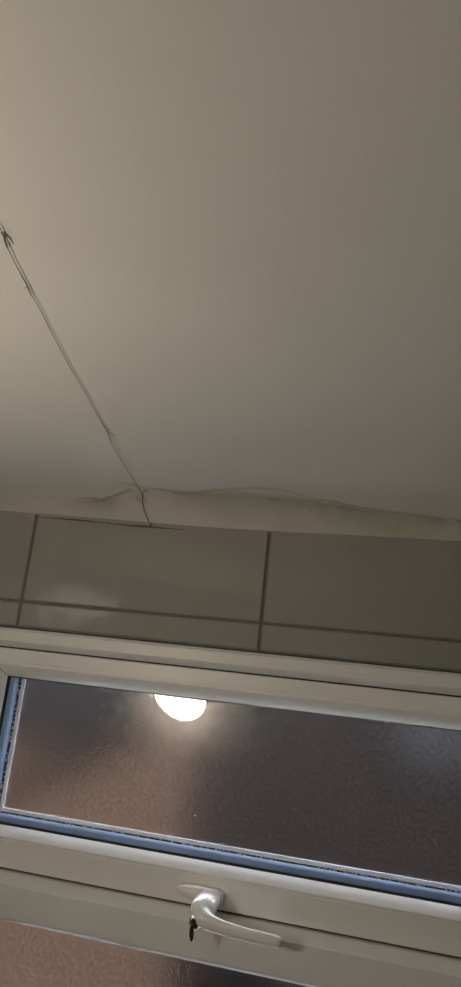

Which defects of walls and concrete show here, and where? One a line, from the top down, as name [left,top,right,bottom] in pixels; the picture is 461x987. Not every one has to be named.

crack [0,227,184,530]